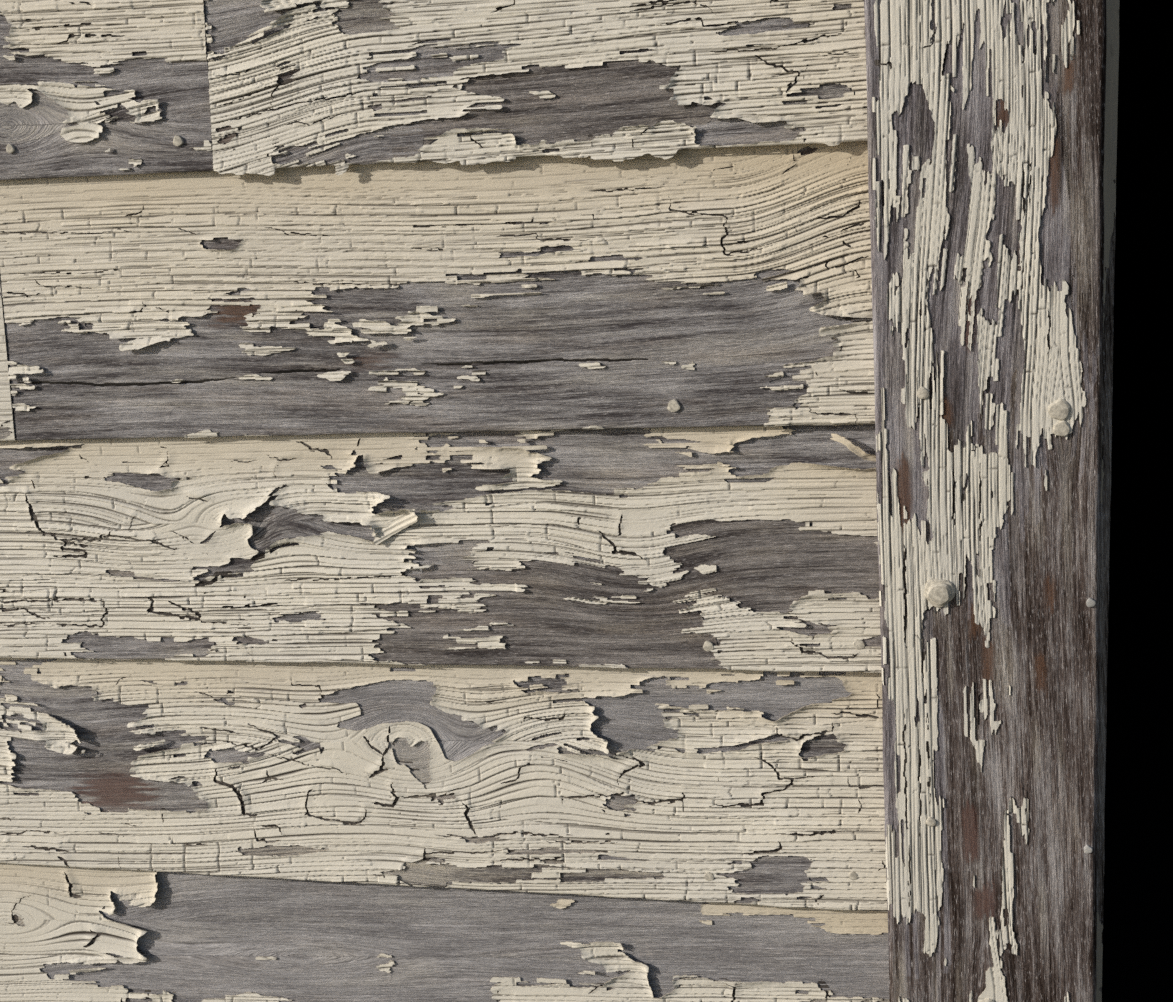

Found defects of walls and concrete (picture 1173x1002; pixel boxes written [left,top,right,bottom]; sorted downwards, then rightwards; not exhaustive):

crack [621,0,892,97]
peeling [0,0,935,582]
crack [26,481,193,558]
peeling [888,0,1107,1002]
crack [0,589,109,628]
peeling [0,658,265,813]
peeling [69,631,214,660]
crack [199,692,611,861]
peeling [320,679,506,787]
crack [562,749,685,811]
peeling [375,510,908,882]
peeling [40,854,890,1002]